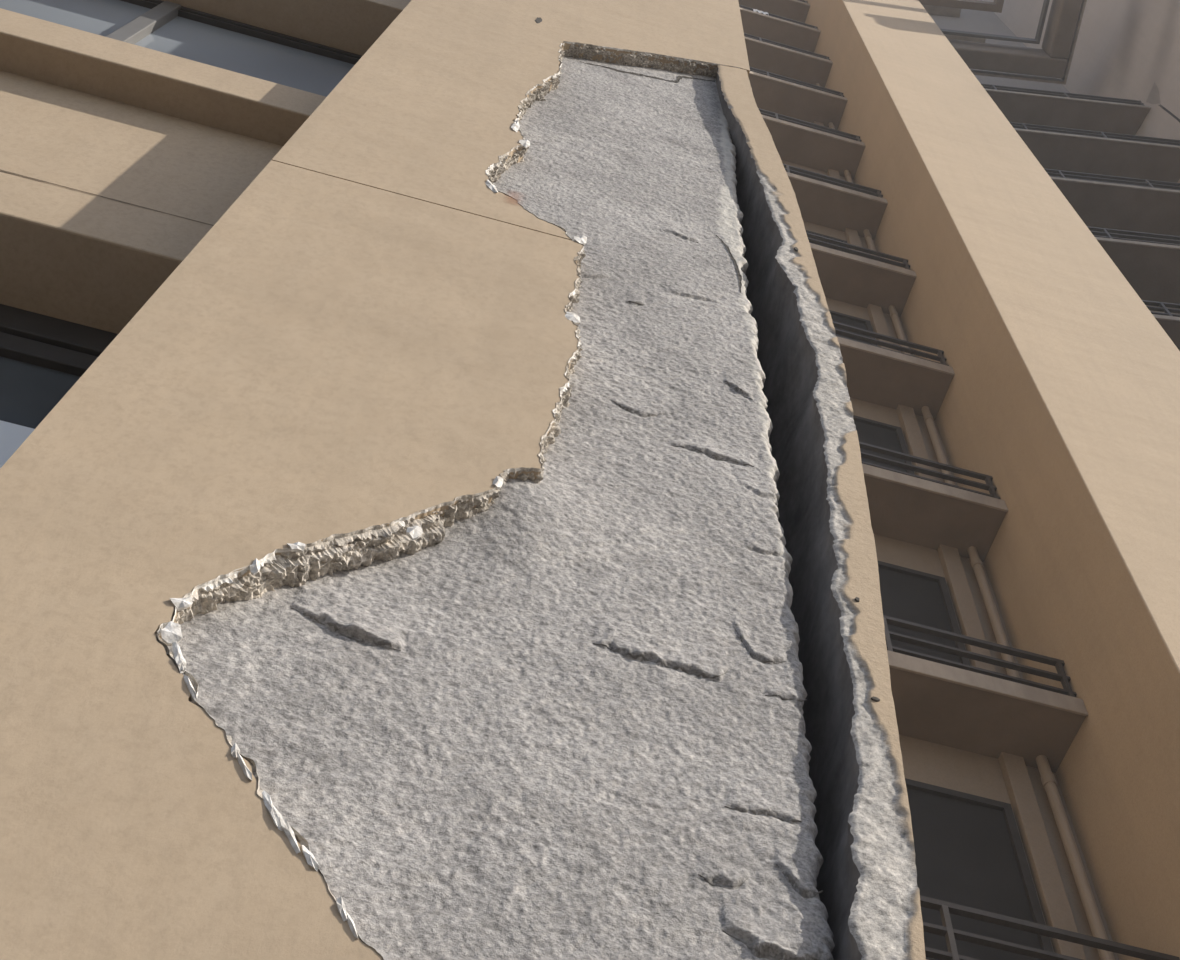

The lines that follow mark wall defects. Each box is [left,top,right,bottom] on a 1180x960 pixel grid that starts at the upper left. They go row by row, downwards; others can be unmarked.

flaking render [155,41,835,960]
crack [579,61,862,960]